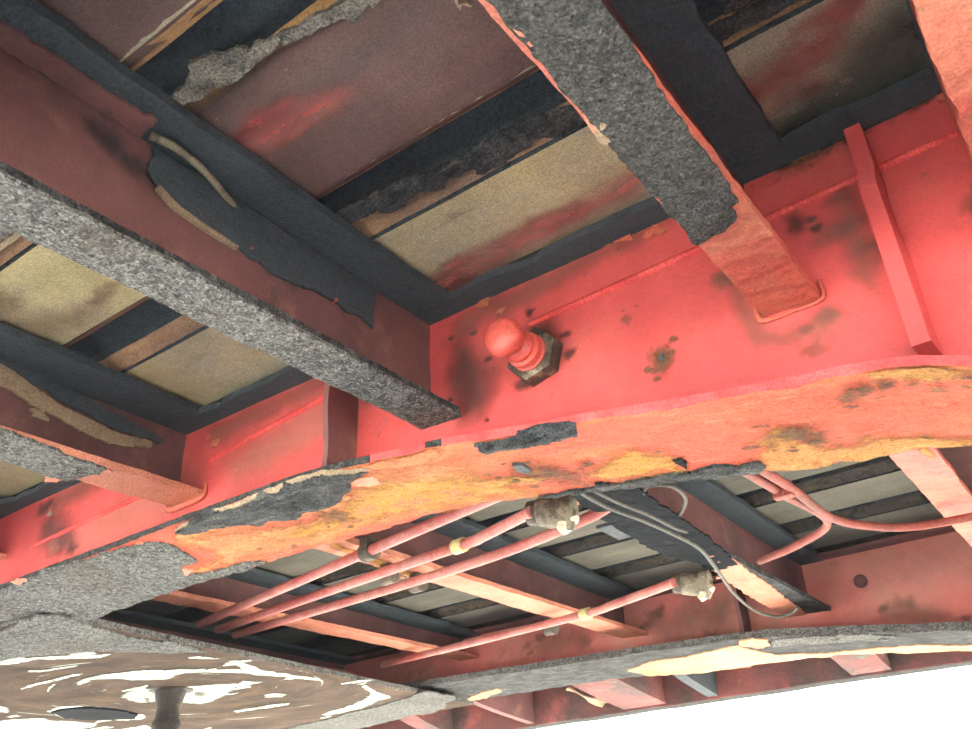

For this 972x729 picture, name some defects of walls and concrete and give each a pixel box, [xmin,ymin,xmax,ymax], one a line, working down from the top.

peeling [184,44,249,84]
peeling [594,123,610,145]
peeling [88,121,376,329]
rust [0,170,462,430]
rust [839,368,972,409]
spalling [174,468,381,536]
rust [0,425,972,662]
peeling [627,638,972,676]